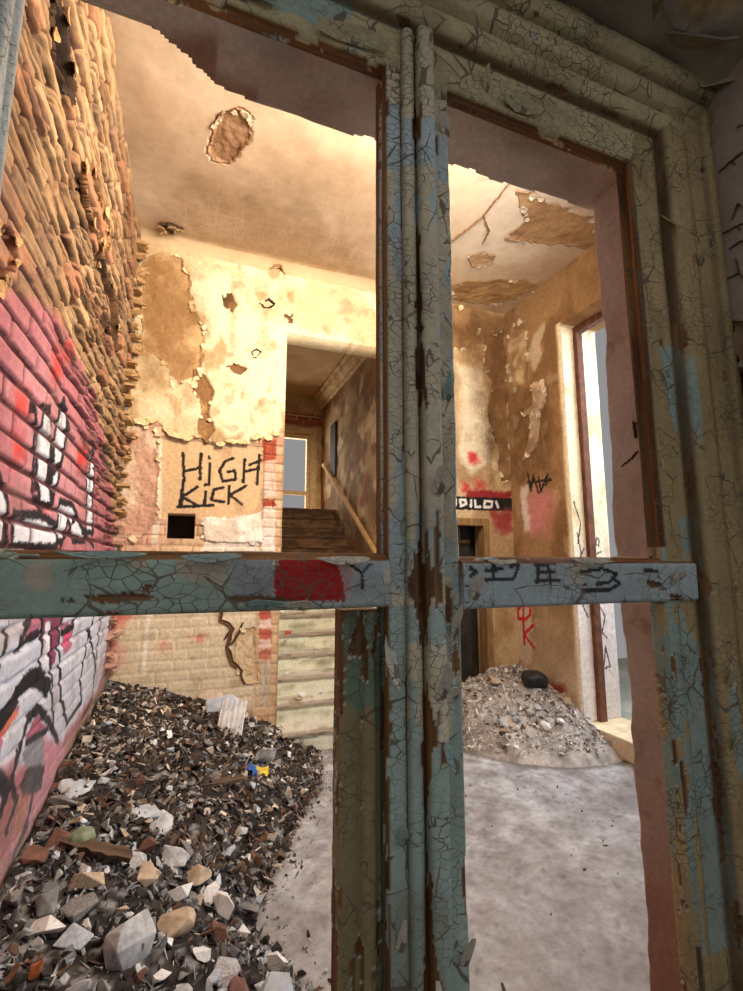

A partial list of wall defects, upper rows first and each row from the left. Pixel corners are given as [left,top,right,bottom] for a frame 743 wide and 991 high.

flaking render [207,107,256,164]
crack [451,184,509,245]
peeling [504,190,595,250]
peeling [467,252,496,268]
flaking render [54,239,280,563]
peeling [451,279,547,484]
crack [218,612,245,685]
peeling [384,635,401,690]